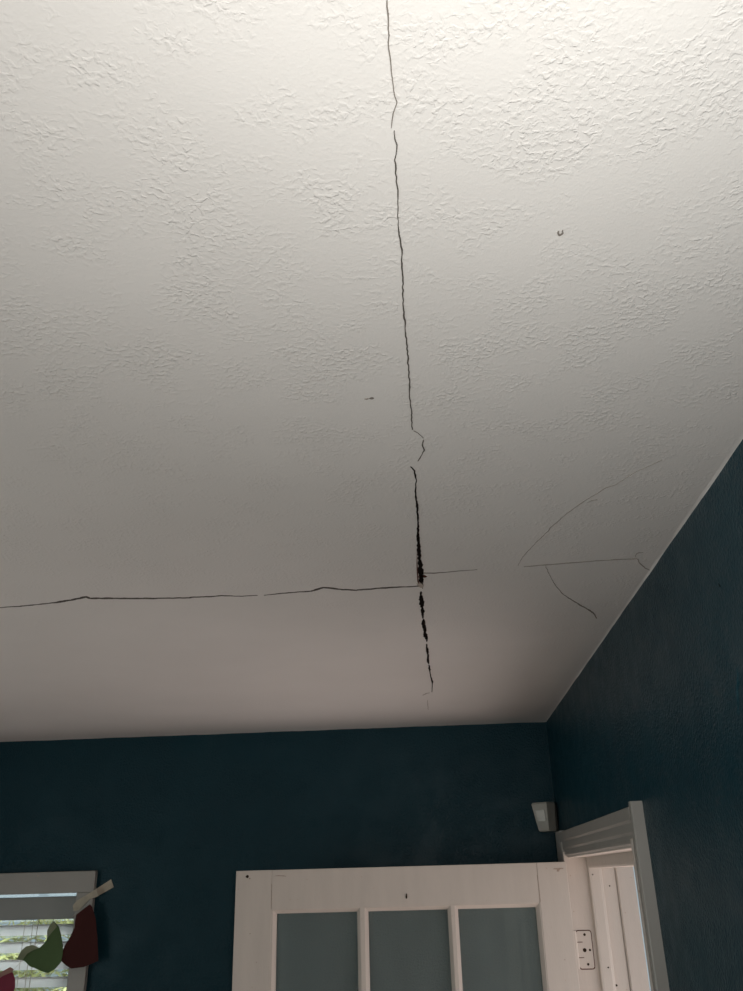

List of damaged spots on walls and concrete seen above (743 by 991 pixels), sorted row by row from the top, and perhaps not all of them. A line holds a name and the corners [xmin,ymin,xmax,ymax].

crack [0,0,477,705]
crack [518,460,662,619]